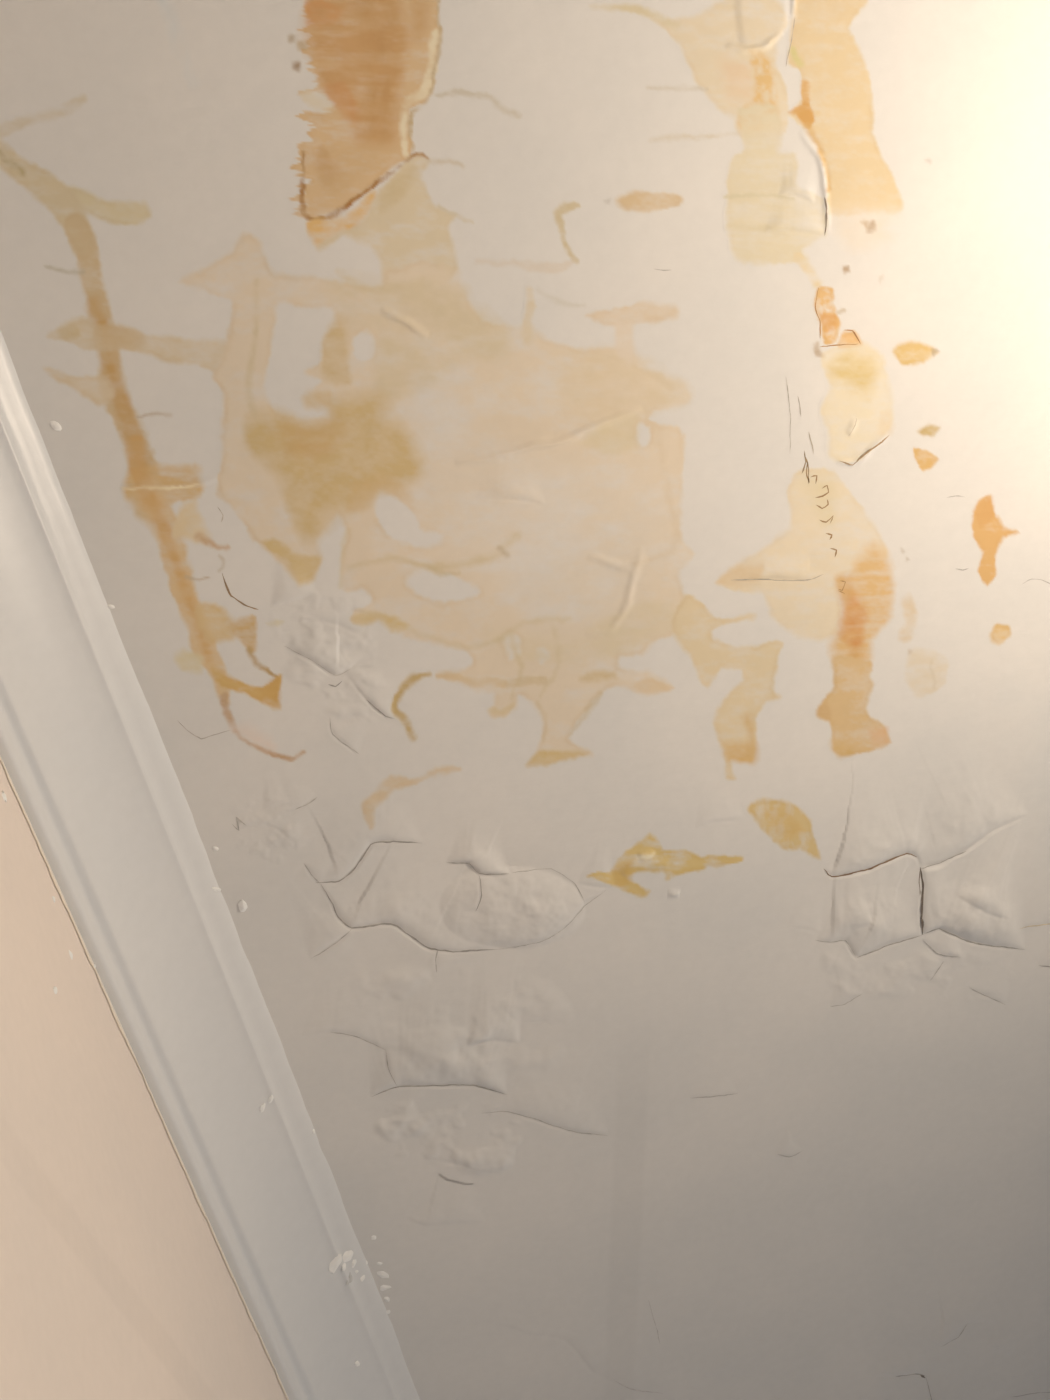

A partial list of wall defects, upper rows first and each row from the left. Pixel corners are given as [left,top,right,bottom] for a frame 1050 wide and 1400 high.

damp [587,0,906,276]
damp [0,0,786,782]
damp [890,338,942,369]
damp [911,421,942,473]
damp [970,493,1021,588]
damp [895,590,952,700]
damp [359,763,463,831]
damp [745,795,823,863]